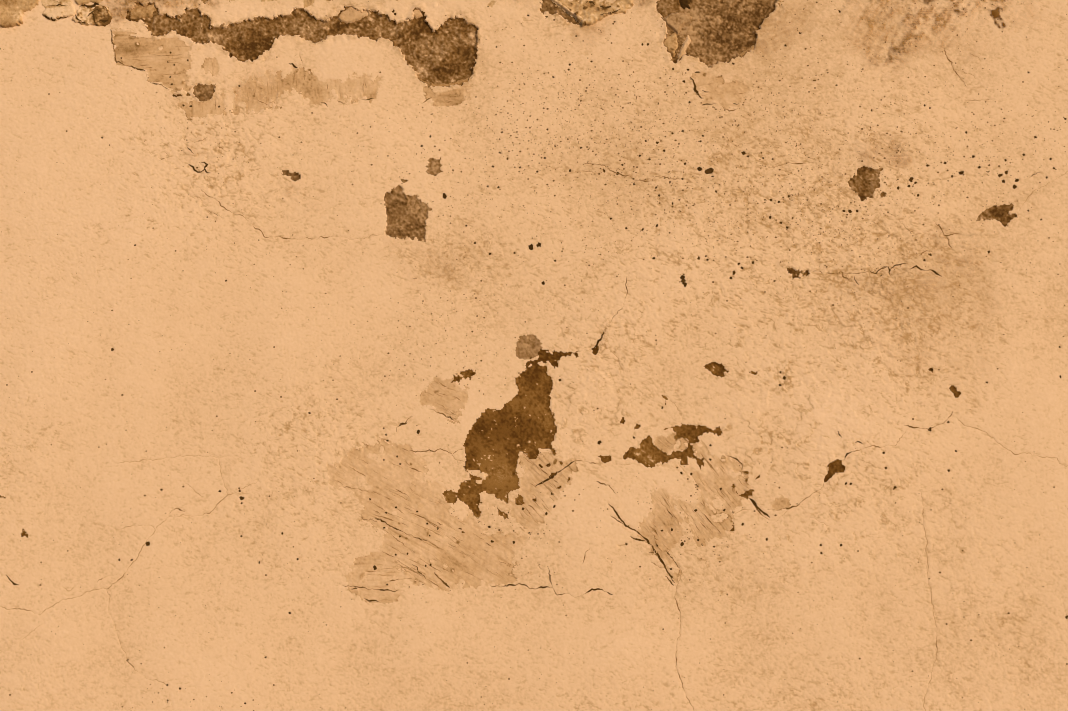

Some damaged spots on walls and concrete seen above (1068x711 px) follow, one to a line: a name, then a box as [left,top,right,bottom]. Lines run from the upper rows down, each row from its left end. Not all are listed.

peeling [527,0,634,37]
spalling [0,0,478,121]
spalling [656,0,784,110]
spalling [384,179,432,242]
spalling [842,166,919,213]
spalling [976,203,1029,227]
peeling [326,334,579,604]
crack [838,411,1067,467]
peeling [598,417,791,585]
crack [735,484,828,526]
crack [2,455,255,685]